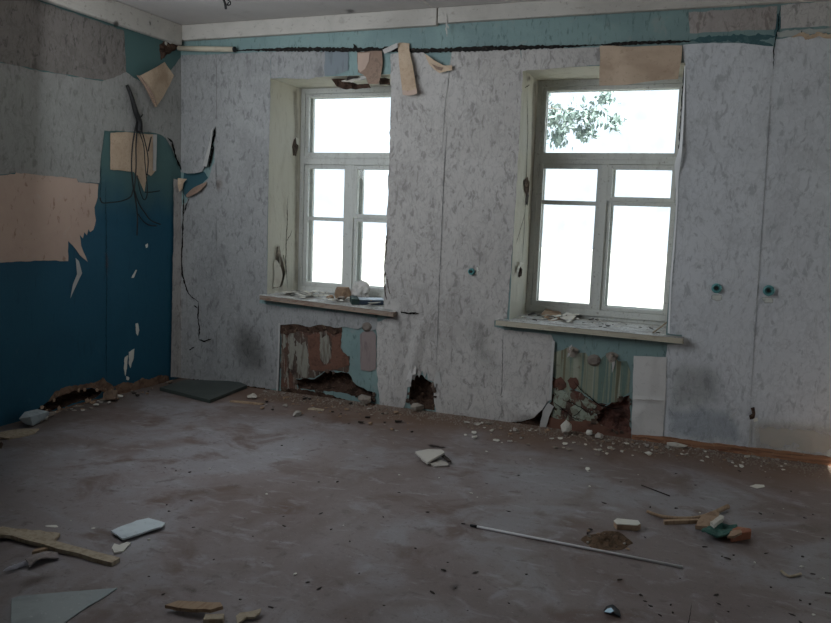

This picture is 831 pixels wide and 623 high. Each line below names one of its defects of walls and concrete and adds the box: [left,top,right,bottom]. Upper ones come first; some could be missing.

spalling [159,41,180,60]
crack [237,6,781,69]
peeling [70,259,82,298]
crack [181,187,211,350]
spalling [39,349,169,412]
spalling [280,324,376,403]
spalling [406,375,437,410]
peeling [513,345,632,439]